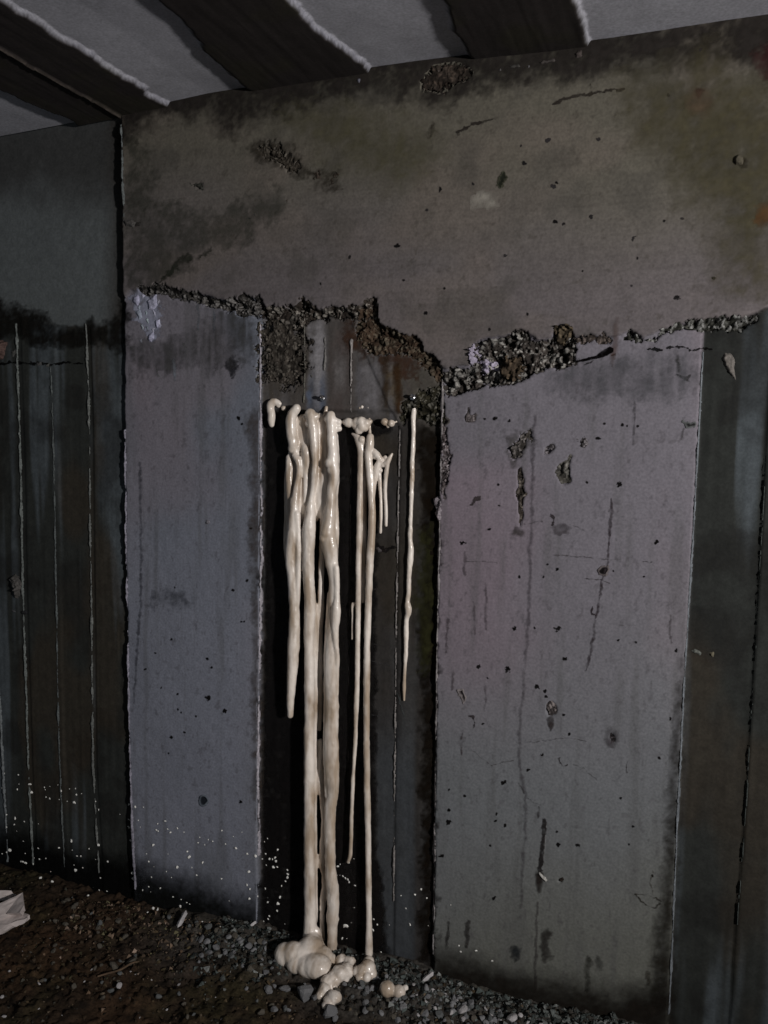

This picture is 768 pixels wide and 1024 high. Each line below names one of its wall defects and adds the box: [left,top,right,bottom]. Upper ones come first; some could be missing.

crack [552,84,625,105]
crack [430,119,493,137]
leakage [0,253,202,378]
peeling [468,344,500,376]
peeling [722,353,736,380]
spalling [555,454,572,484]
spalling [513,468,527,535]